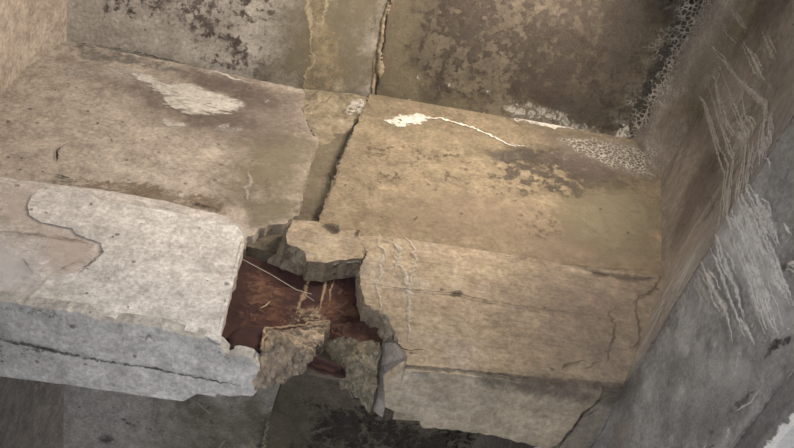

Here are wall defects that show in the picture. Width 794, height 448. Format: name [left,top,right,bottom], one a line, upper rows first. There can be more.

water stain [64,0,297,143]
water stain [302,0,345,92]
peeling [54,174,223,212]
water stain [384,0,794,345]
crack [0,338,241,386]
spalling [267,220,318,278]
rust [251,278,357,351]
spalling [252,260,407,417]
water stain [375,236,418,342]
crack [482,194,720,448]
water stain [251,395,474,448]